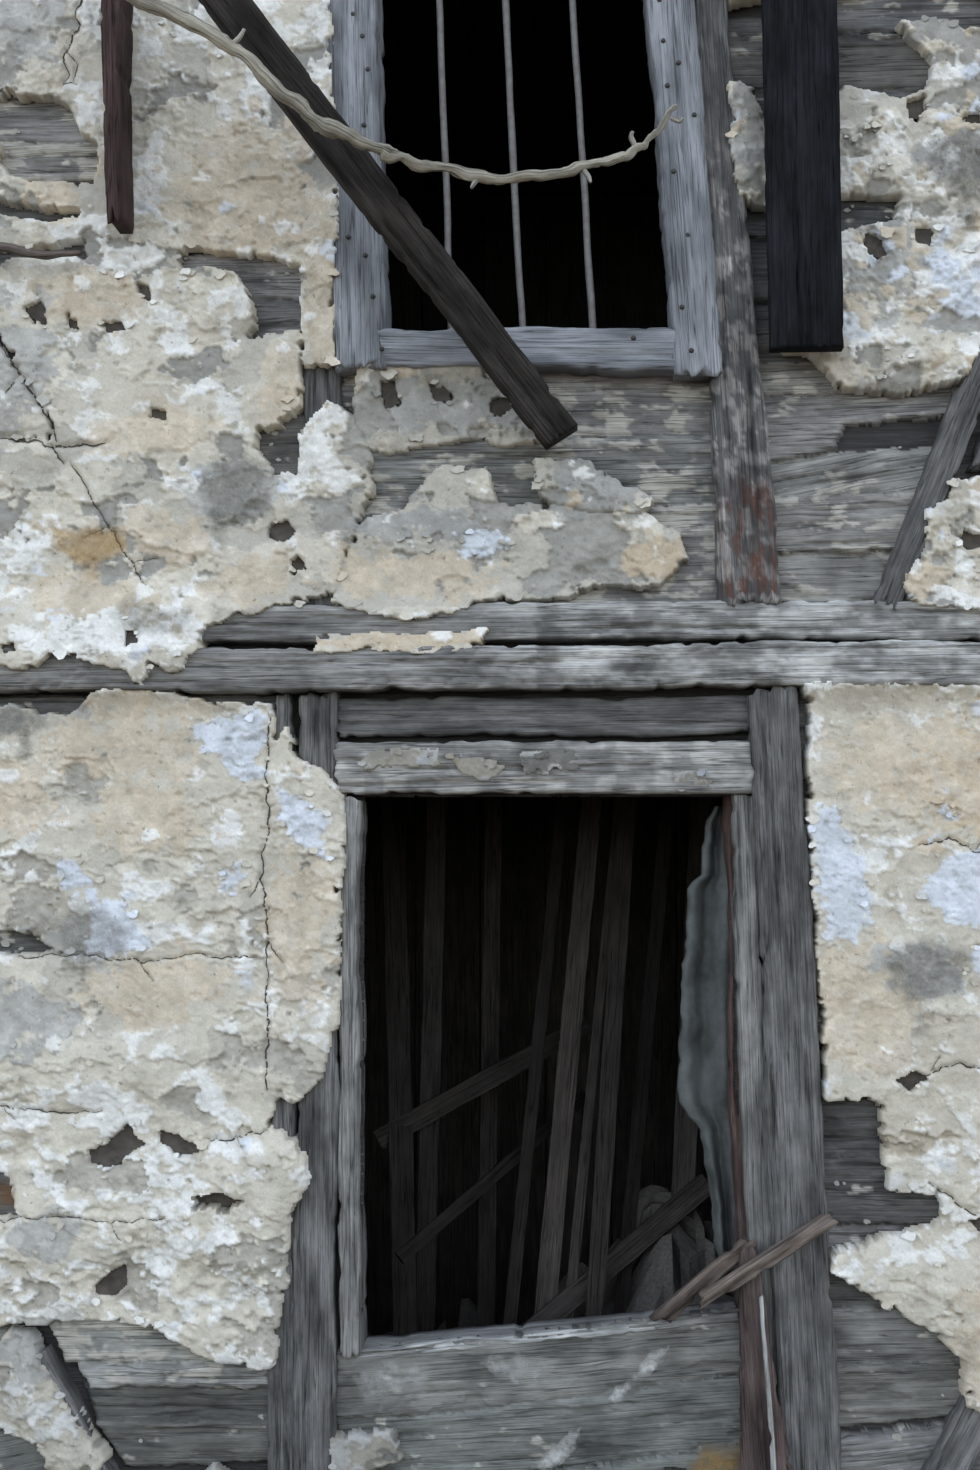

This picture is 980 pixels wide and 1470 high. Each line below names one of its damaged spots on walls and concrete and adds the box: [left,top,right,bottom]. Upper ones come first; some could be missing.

flaking render [727,0,761,11]
flaking render [725,79,766,214]
flaking render [759,0,980,611]
crack [0,343,155,583]
flaking render [0,0,713,1470]
crack [21,717,281,1088]
crack [212,1131,265,1149]
flaking render [799,681,980,1470]
crack [929,1183,976,1216]